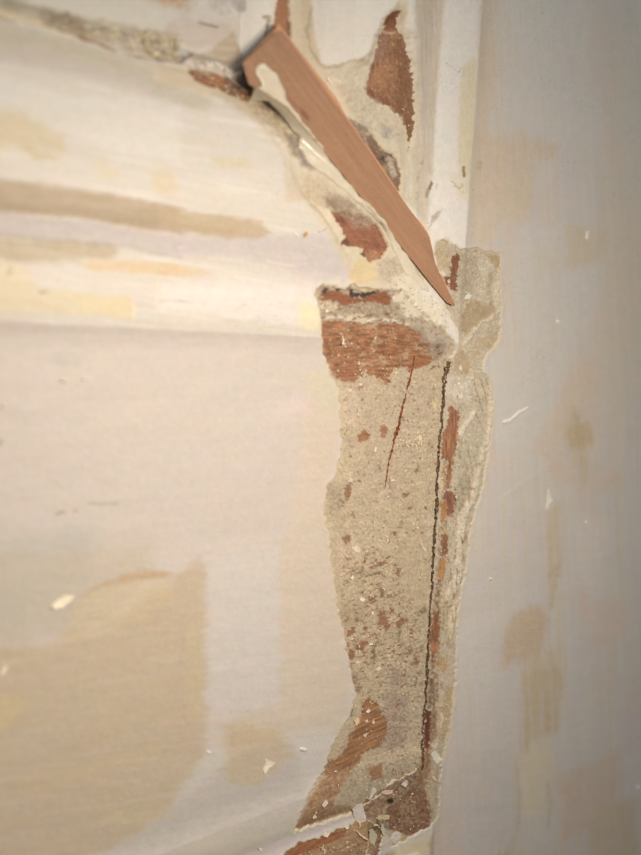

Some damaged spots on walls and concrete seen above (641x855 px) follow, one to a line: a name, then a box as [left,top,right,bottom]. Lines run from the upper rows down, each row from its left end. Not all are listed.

peeling [272,0,290,37]
peeling [367,10,415,148]
peeling [366,135,401,191]
peeling [331,211,387,262]
crack [385,355,415,487]
peeling [284,240,501,855]
crack [420,361,451,770]